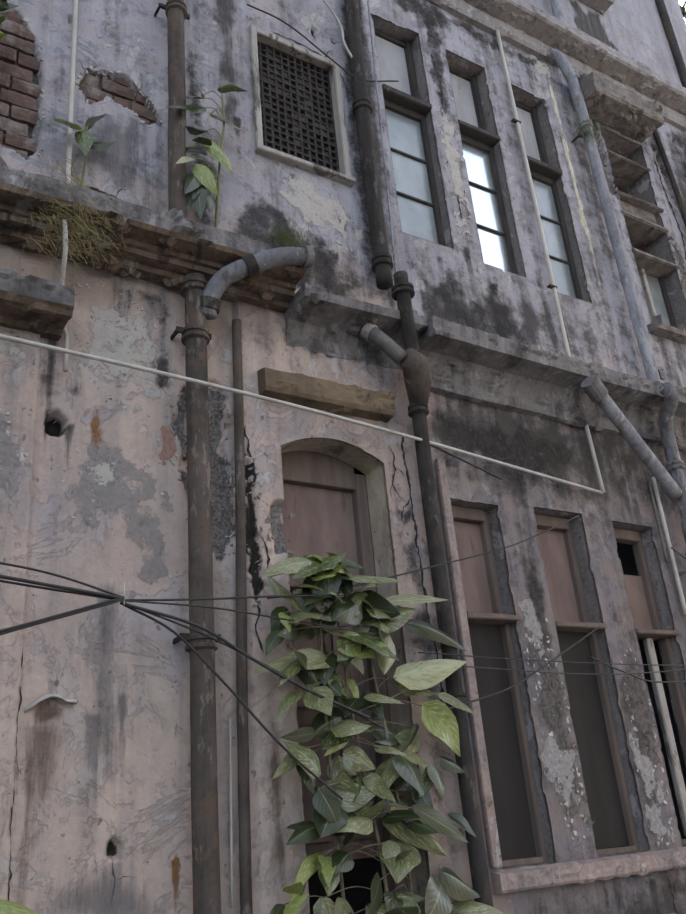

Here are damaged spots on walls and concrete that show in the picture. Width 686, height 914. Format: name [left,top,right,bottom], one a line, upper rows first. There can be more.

spalling [0,11,46,160]
spalling [75,62,163,127]
damp [238,202,354,297]
corrosion [91,410,101,448]
peeling [62,293,187,586]
crack [244,425,270,653]
crack [390,428,438,659]
peeling [517,598,595,849]
peeling [619,648,676,847]